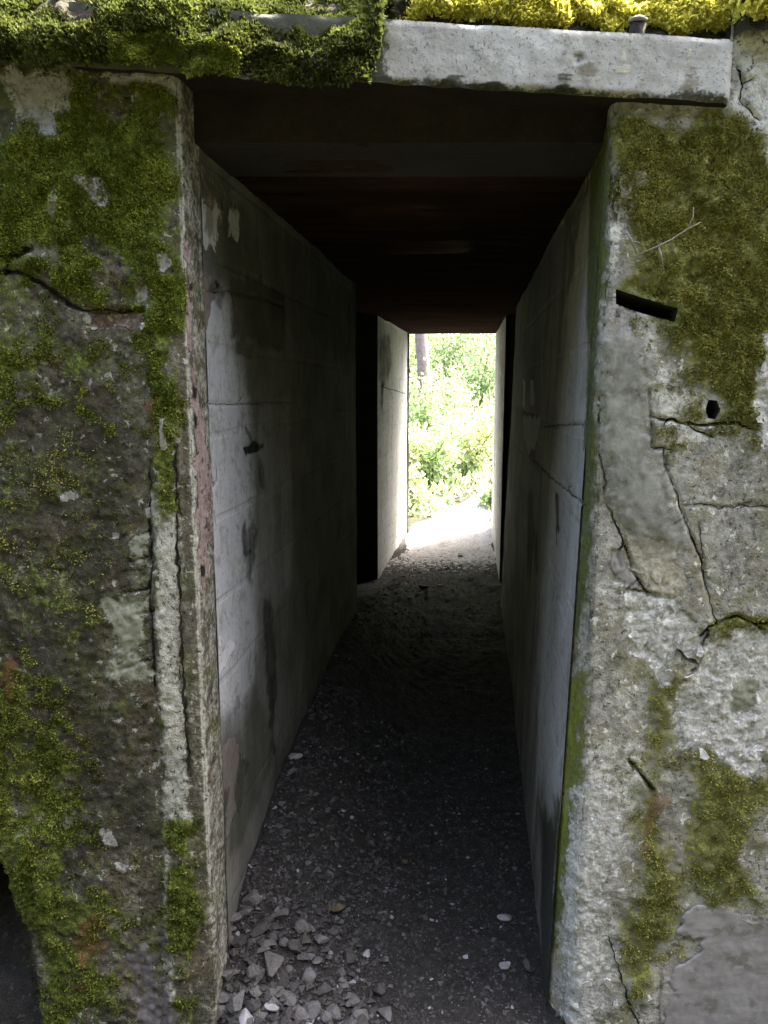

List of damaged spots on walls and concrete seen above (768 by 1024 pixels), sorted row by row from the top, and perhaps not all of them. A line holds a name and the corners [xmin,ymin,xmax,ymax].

crack [736,69,759,120]
crack [0,246,142,314]
crack [648,390,768,645]
crack [122,452,191,776]
flaking render [659,904,768,1024]